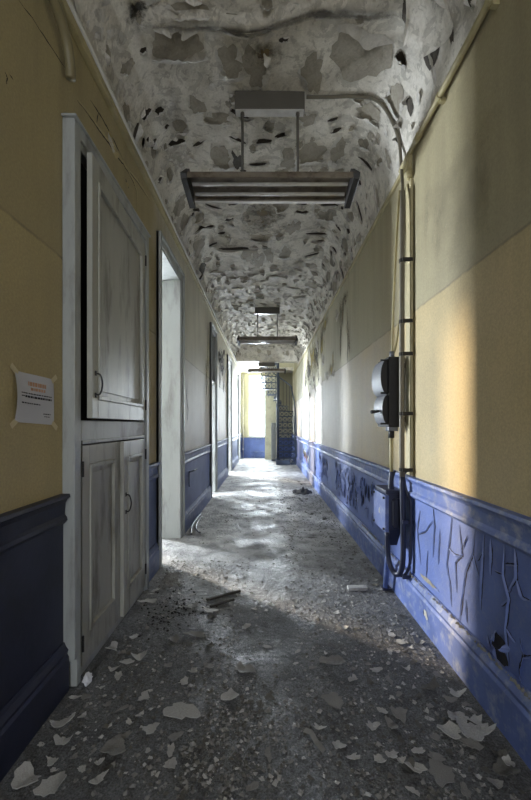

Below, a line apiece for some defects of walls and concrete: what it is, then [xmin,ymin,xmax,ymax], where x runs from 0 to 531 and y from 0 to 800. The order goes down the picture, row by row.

peeling [110,0,454,185]
peeling [165,180,387,399]
crack [417,509,531,682]
peeling [490,630,510,667]